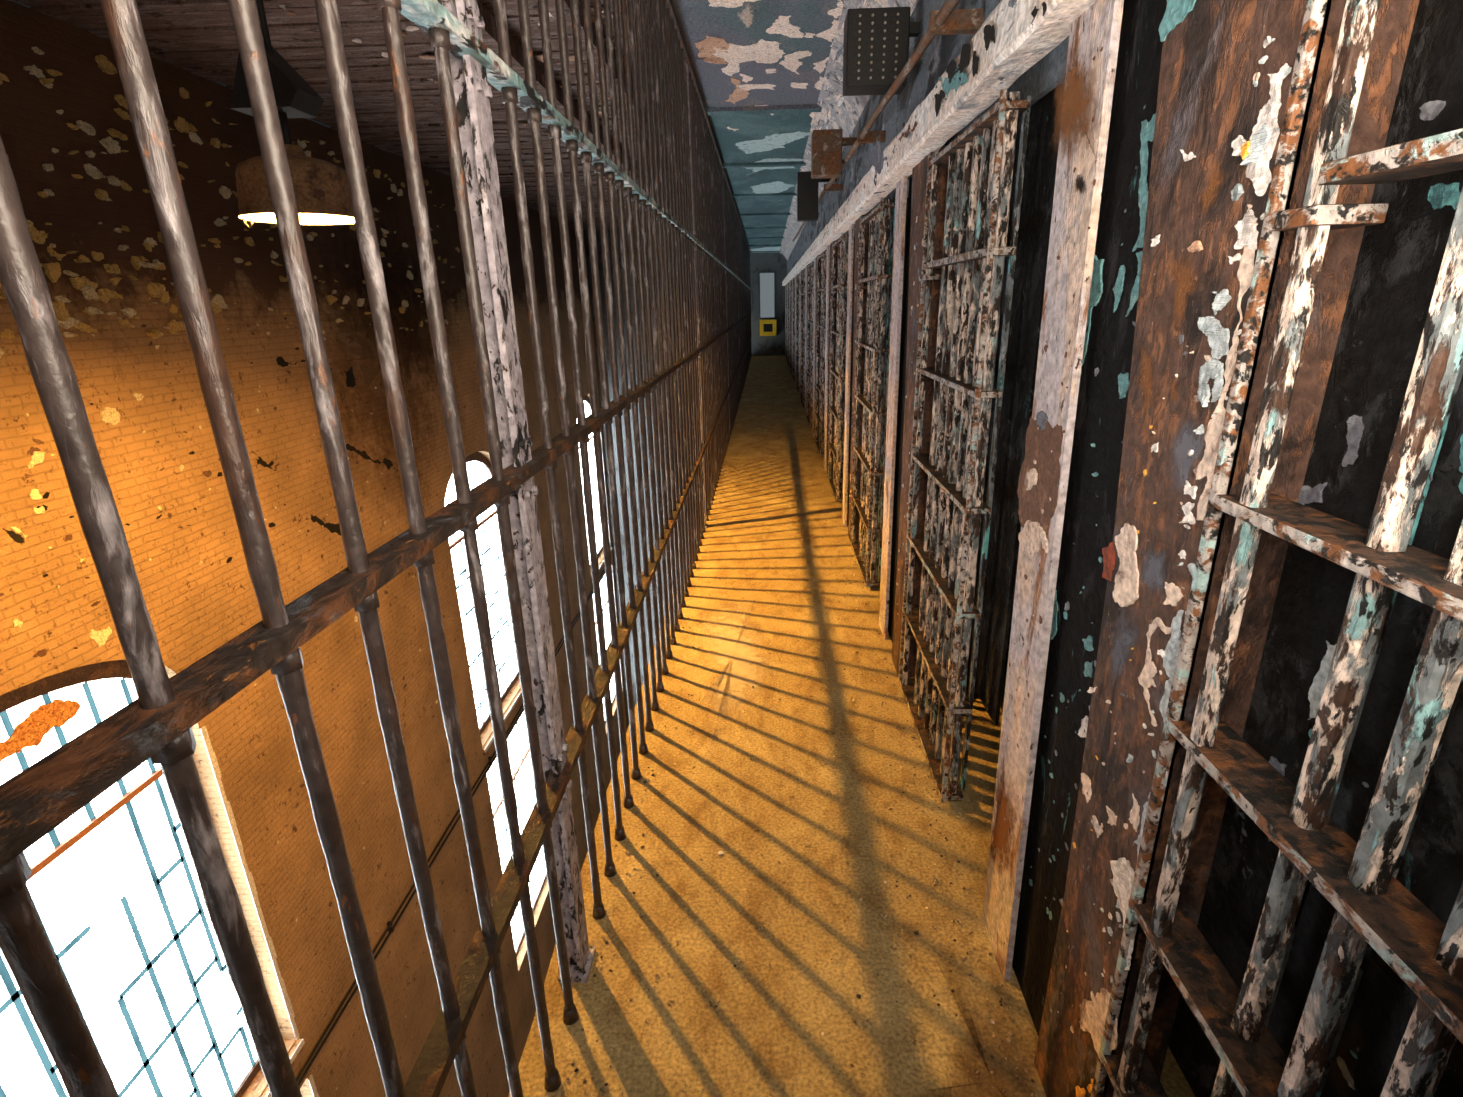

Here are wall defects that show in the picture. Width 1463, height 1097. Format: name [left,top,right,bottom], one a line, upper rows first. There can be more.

peeling [0,47,62,88]
peeling [42,94,150,201]
peeling [165,87,238,184]
peeling [26,219,188,349]
peeling [201,180,288,282]
peeling [365,166,470,330]
peeling [1143,36,1292,529]
spalling [1017,409,1065,556]
peeling [1014,586,1085,644]
peeling [1050,523,1196,1056]
peeling [1029,842,1076,920]
peeling [1075,1079,1094,1097]